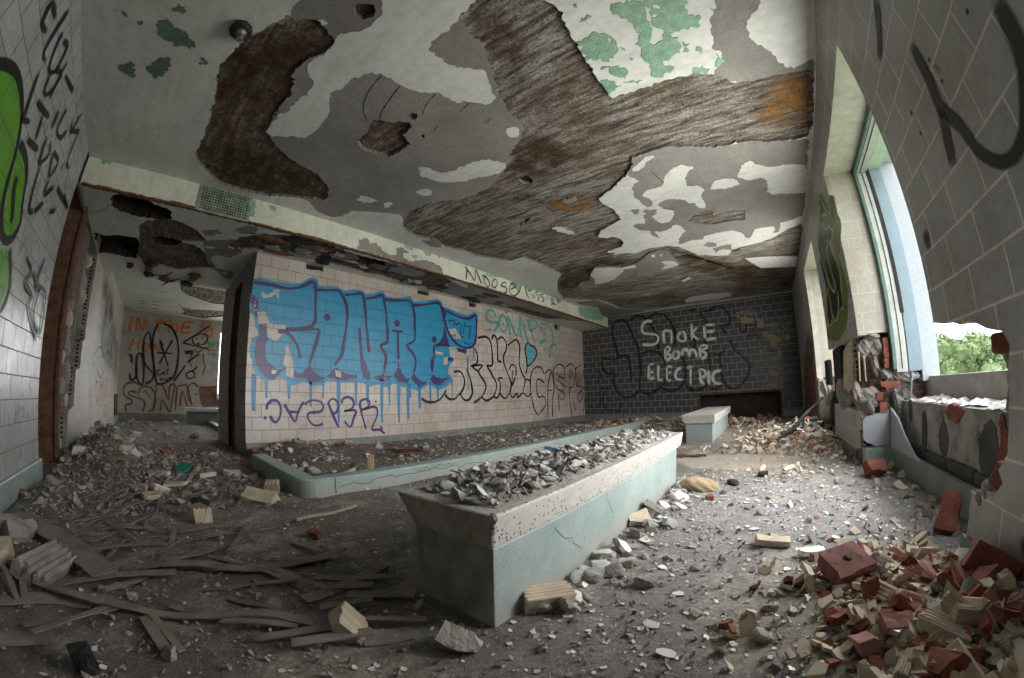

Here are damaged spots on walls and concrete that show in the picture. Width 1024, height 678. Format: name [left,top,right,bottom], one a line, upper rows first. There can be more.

rust [759,77,809,126]
spalling [93,0,868,420]
spalling [991,331,1010,355]